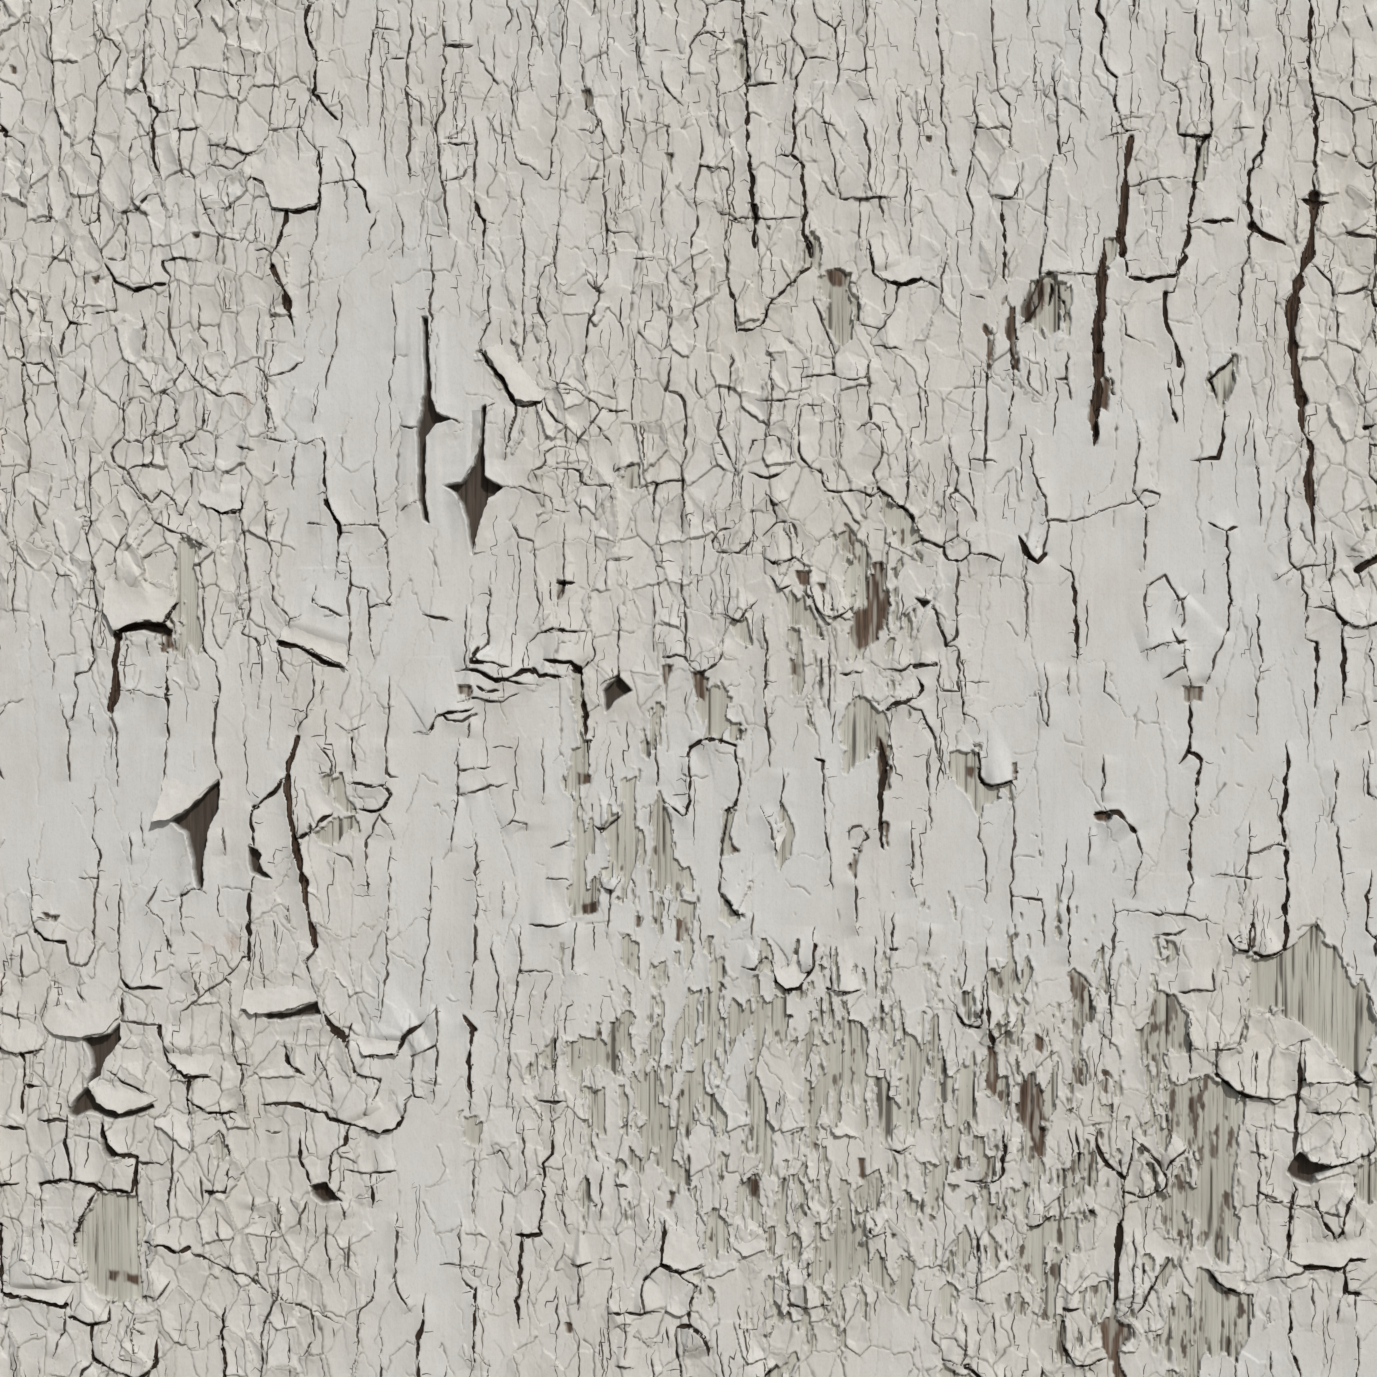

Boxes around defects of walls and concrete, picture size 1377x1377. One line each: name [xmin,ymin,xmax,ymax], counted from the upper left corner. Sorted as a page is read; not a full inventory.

peeling [475,350,522,405]
crack [0,0,447,1377]
peeling [772,491,925,732]
peeling [526,664,1270,1377]
peeling [1239,922,1377,1127]
peeling [75,1192,147,1303]
peeling [1353,1154,1377,1206]